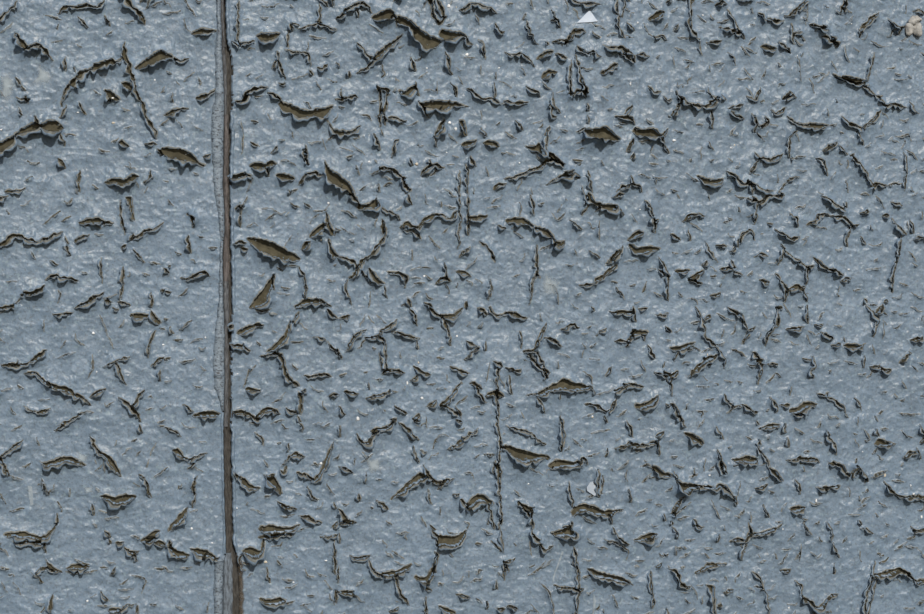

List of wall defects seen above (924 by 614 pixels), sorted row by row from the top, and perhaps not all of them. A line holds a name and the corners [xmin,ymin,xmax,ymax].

peeling [355,7,473,74]
peeling [0,115,67,158]
peeling [267,91,361,140]
peeling [397,81,501,150]
peeling [576,114,671,160]
peeling [62,172,164,264]
peeling [248,159,382,213]
peeling [246,212,339,310]
peeling [390,464,496,530]
peeling [503,415,624,542]
peeling [237,523,300,572]
peeling [349,528,467,614]